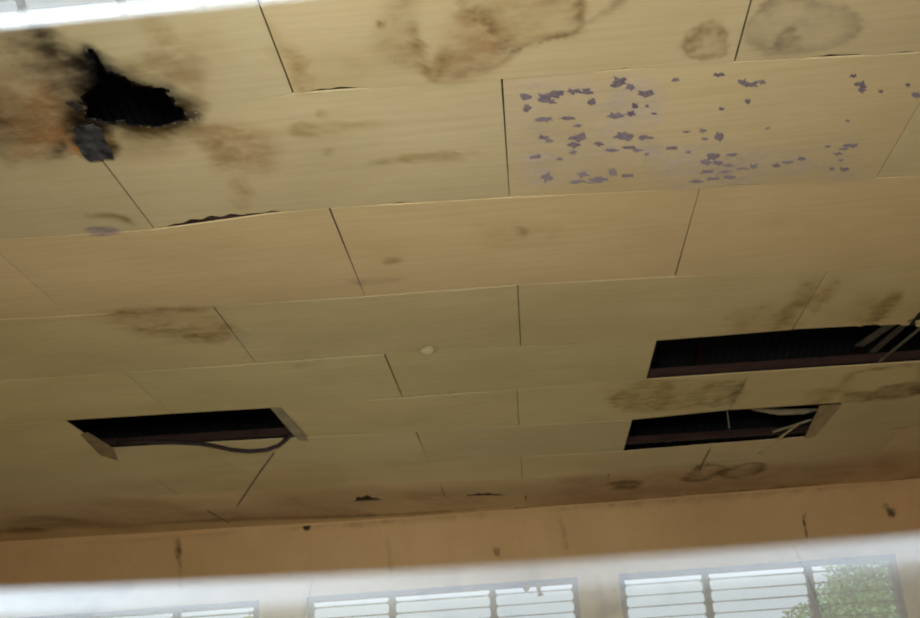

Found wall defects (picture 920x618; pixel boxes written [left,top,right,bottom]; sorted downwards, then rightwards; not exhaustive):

damp [65,50,199,153]
peeling [606,76,657,119]
peeling [738,78,767,87]
peeling [849,74,867,94]
peeling [520,87,654,161]
peeling [682,128,724,142]
peeling [569,168,634,184]
peeling [689,153,758,183]